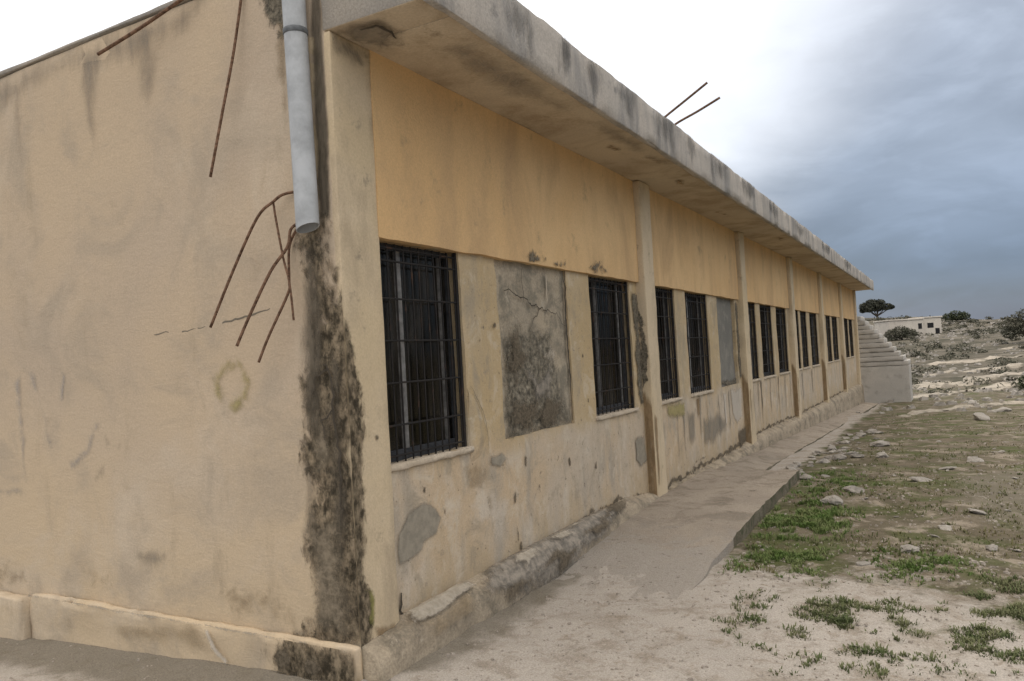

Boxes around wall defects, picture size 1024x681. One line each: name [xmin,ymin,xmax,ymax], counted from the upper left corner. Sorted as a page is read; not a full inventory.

damp [293,0,373,649]
spalling [503,326,569,438]
crack [504,271,573,419]
peeling [398,487,441,564]
spalling [409,500,627,630]